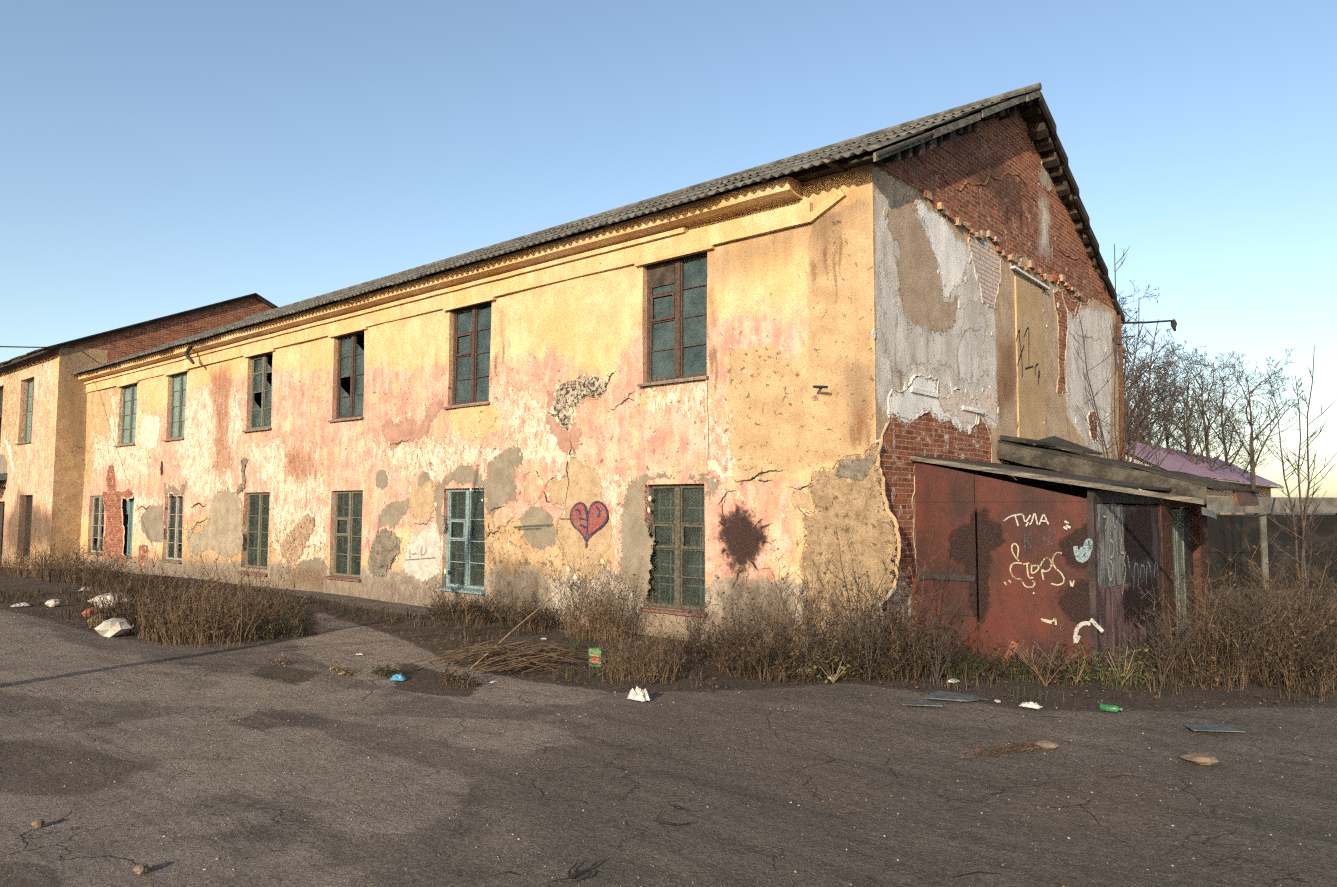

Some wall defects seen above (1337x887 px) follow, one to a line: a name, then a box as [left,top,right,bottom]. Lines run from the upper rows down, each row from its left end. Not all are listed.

flaking render [186,445,249,564]
flaking render [280,504,327,573]
flaking render [368,372,727,632]
flaking render [782,156,1109,658]